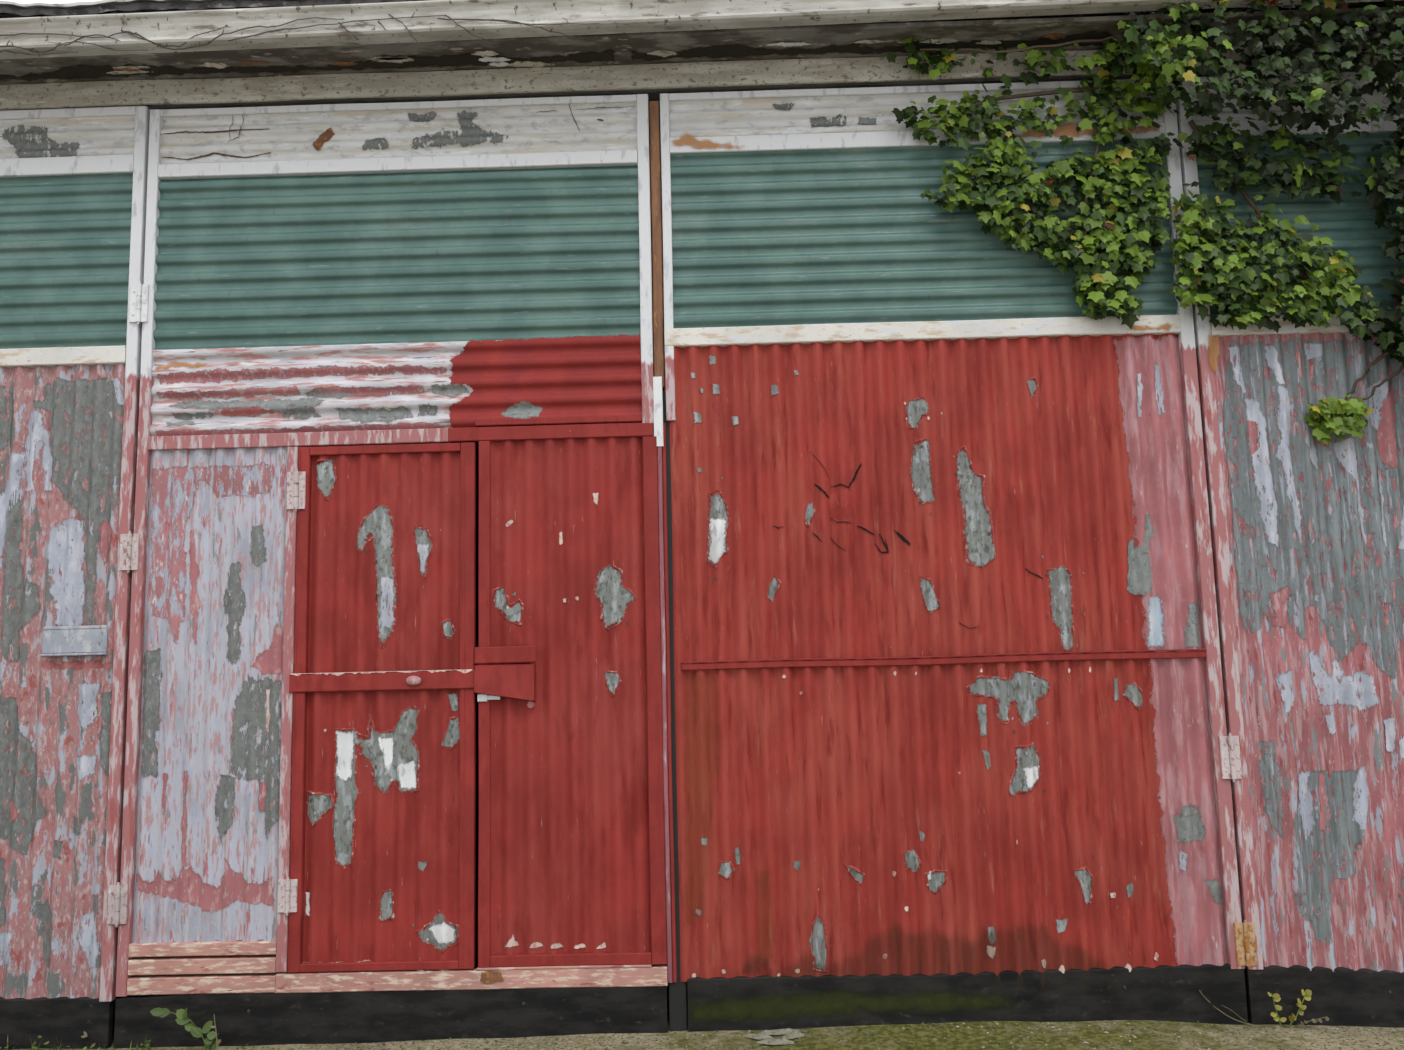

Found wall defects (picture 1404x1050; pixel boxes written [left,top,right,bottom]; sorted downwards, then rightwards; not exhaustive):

rust [673,134,737,149]
peeling [166,383,470,426]
peeling [0,376,124,662]
peeling [355,504,398,649]
peeling [706,477,731,580]
crack [772,451,910,553]
peeling [953,445,996,569]
peeling [1222,337,1404,758]
peeling [214,669,472,844]
peeling [306,705,420,869]
peeling [966,668,1050,799]
peeling [413,910,459,971]